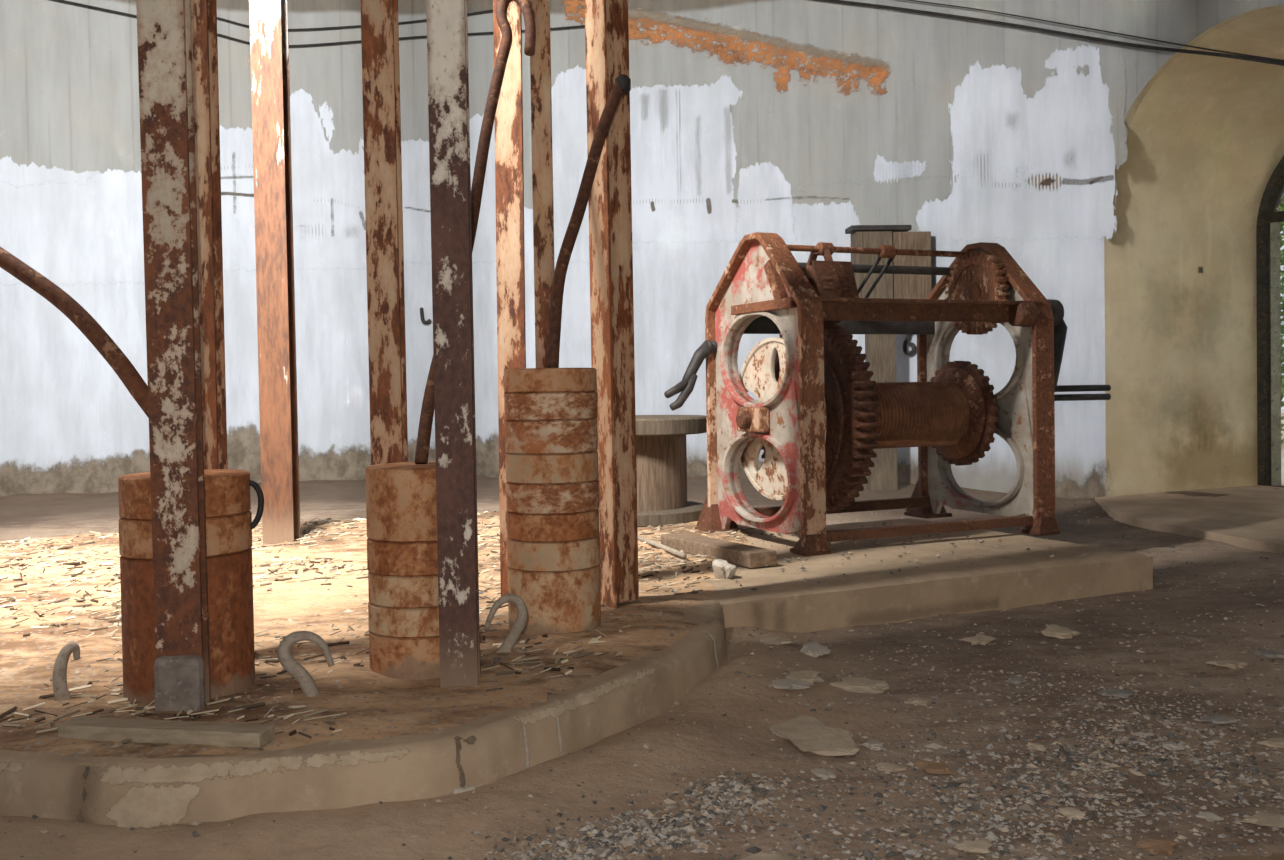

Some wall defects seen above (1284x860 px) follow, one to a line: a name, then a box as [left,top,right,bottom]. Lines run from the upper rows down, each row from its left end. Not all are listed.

corrosion [563,0,585,25]
corrosion [628,8,890,96]
peeling [220,125,256,272]
peeling [290,89,367,271]
peeling [401,138,432,265]
peeling [469,114,496,264]
peeling [551,65,590,263]
peeling [630,30,1128,245]
crack [453,736,476,794]